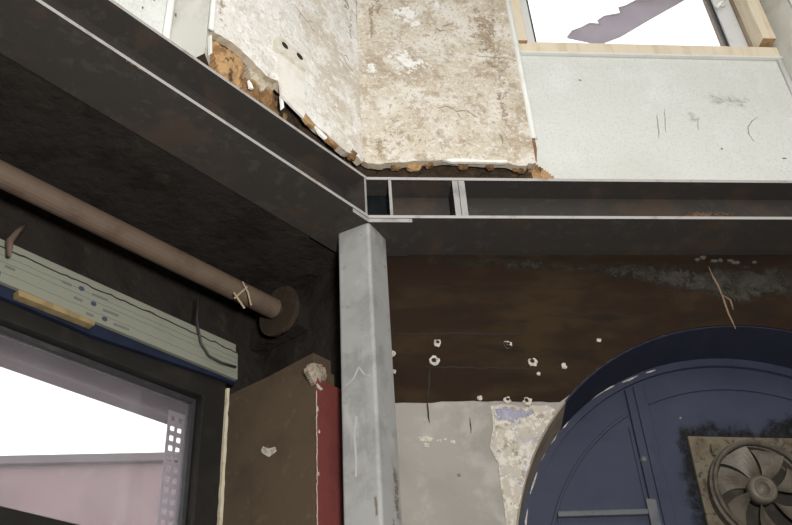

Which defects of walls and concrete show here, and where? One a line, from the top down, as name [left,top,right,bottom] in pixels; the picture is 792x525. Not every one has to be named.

flaking render [208,35,554,179]
leakage [470,8,507,84]
flaking render [429,340,441,366]
peeling [490,396,557,525]